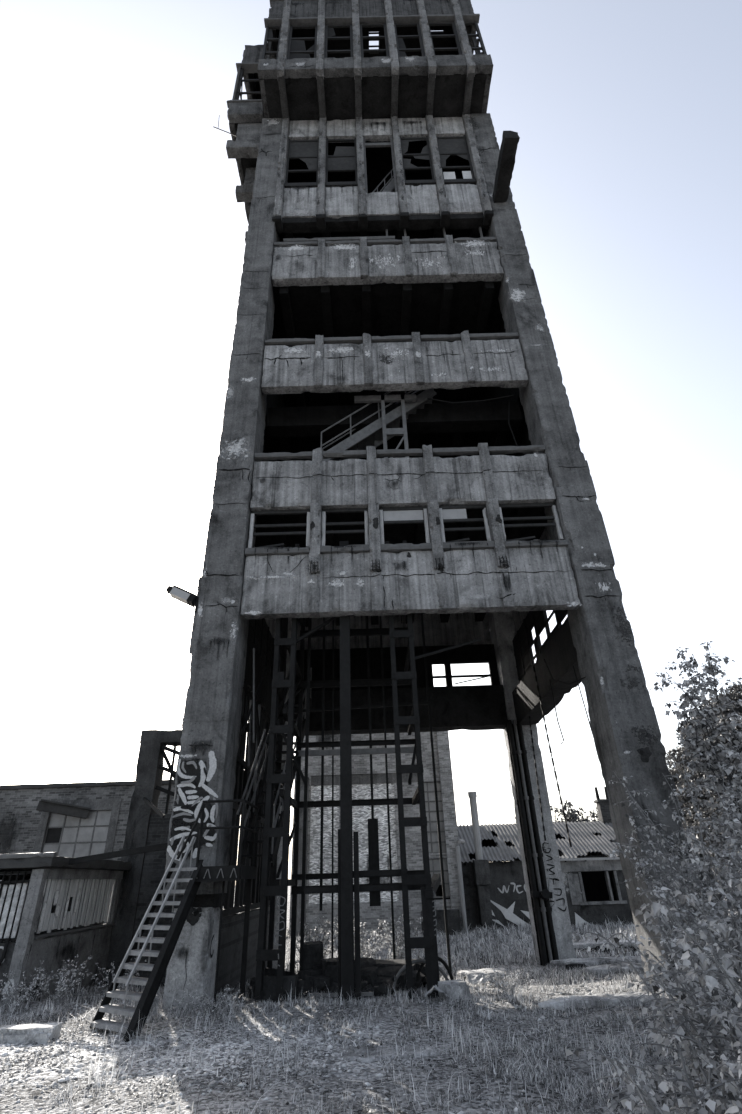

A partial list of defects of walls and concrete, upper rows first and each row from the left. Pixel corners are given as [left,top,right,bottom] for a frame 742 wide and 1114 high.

spalling [506,279,526,302]
spalling [221,438,248,459]
crack [204,567,239,614]